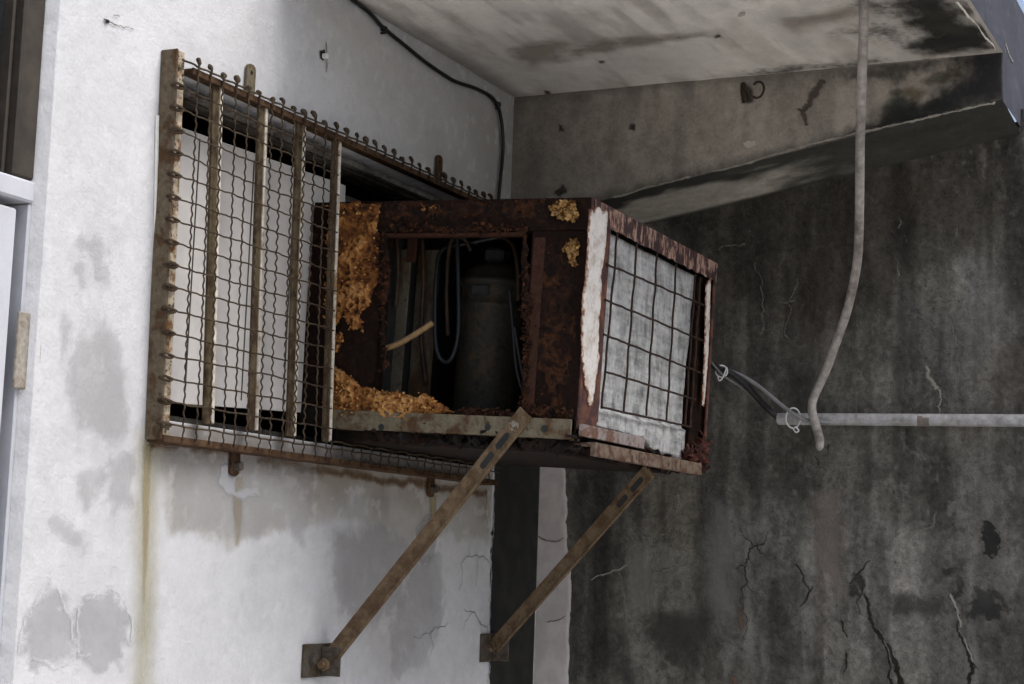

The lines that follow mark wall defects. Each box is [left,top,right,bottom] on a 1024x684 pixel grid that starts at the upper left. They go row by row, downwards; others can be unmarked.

damp [578,37,687,63]
damp [816,0,1001,130]
damp [219,465,260,500]
crack [413,552,490,654]
crack [731,532,768,640]
crack [795,563,813,607]
crack [840,560,904,684]
damp [894,587,1011,662]
crack [954,607,980,684]